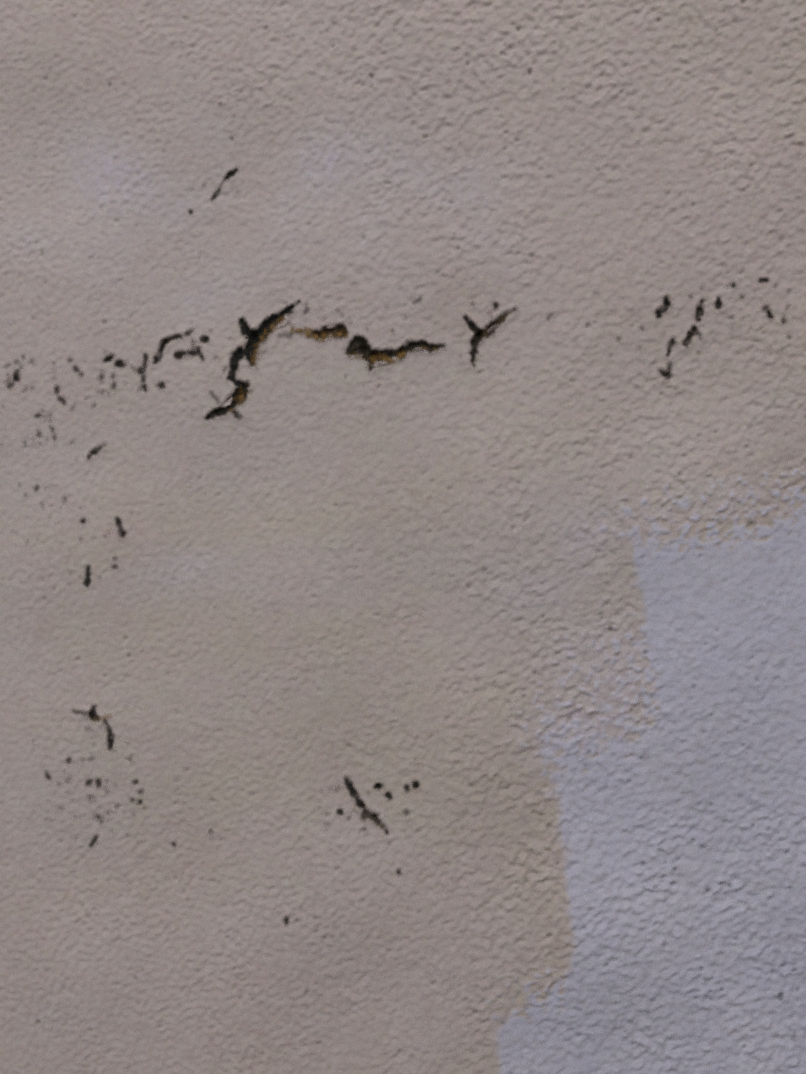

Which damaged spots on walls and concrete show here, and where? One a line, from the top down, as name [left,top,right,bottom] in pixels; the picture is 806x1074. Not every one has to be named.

crack [211,168,238,200]
crack [153,334,182,364]
crack [205,300,516,420]
crack [656,296,722,379]
crack [87,447,102,459]
crack [73,705,114,749]
crack [345,777,388,834]